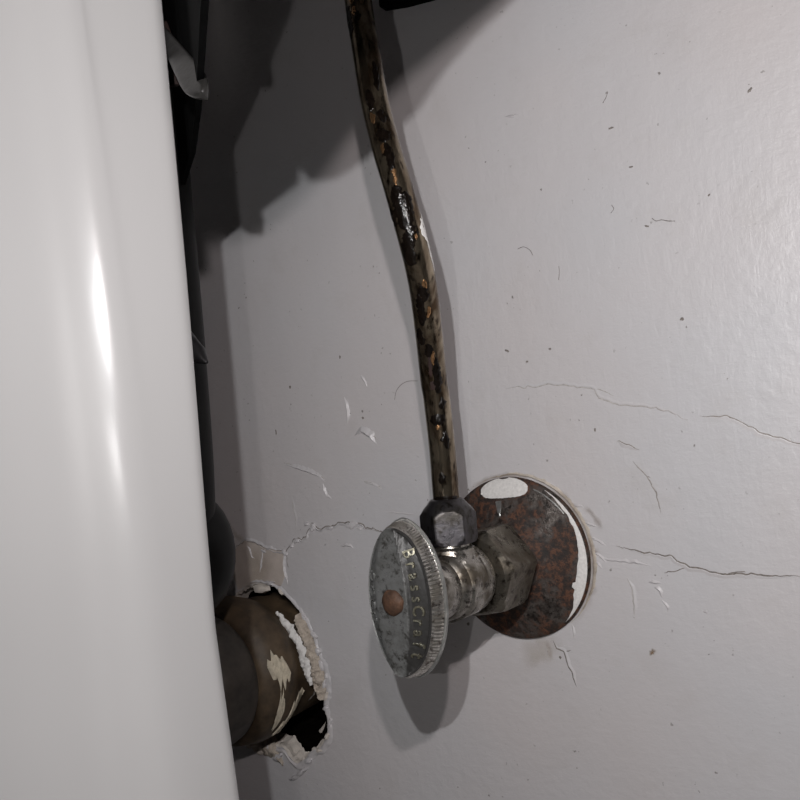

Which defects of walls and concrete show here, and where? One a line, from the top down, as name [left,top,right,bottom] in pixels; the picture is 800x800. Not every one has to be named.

rust [365,61,396,170]
rust [389,184,419,266]
rust [416,285,450,449]
crack [505,380,800,447]
crack [618,440,661,512]
crack [260,521,382,568]
crack [596,546,800,616]
flaking render [233,538,333,780]
crack [553,641,578,687]